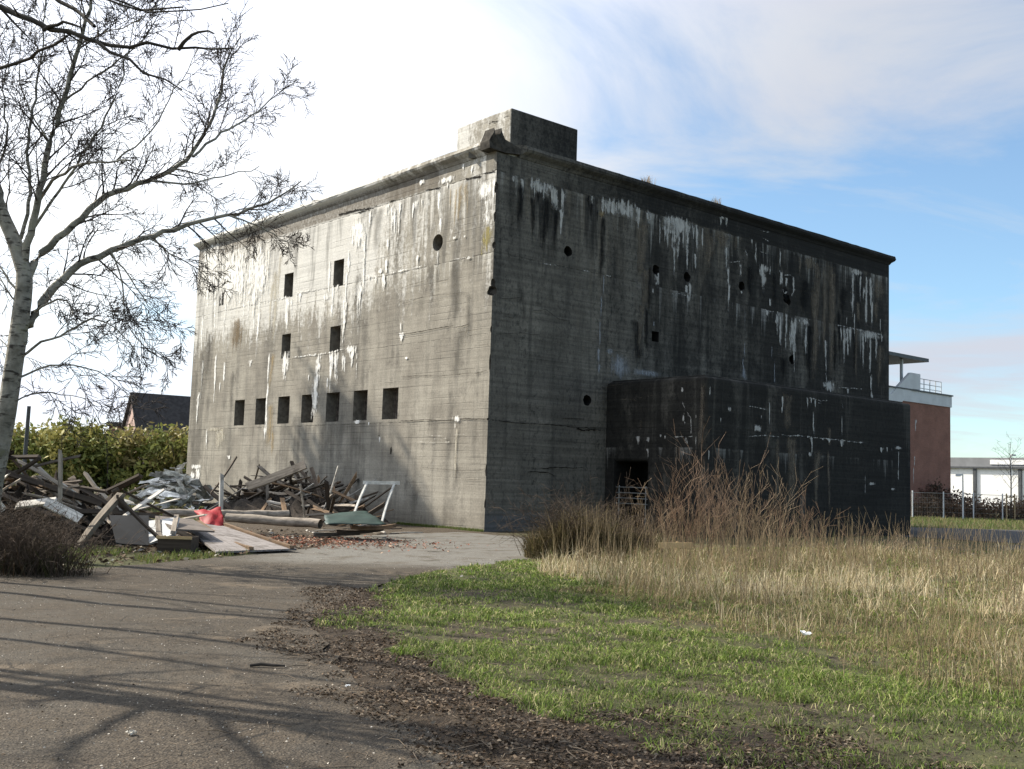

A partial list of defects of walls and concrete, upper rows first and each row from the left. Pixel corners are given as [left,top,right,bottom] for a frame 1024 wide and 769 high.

water stain [512,176,565,241]
water stain [200,199,438,413]
water stain [659,216,882,398]
water stain [196,356,225,422]
water stain [750,377,862,507]